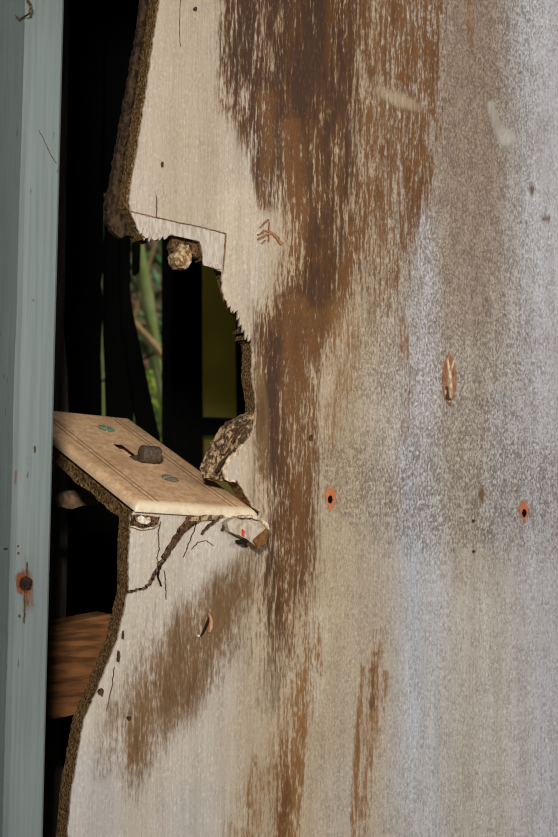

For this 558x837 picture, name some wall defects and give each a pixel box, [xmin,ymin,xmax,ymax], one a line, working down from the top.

peeling [130,211,227,272]
peeling [221,444,243,483]
spalling [130,514,160,530]
peeling [221,515,270,549]
corrosion [325,486,336,511]
corrosion [519,500,530,521]
crack [127,515,225,600]
corrosion [17,562,33,623]
peeling [196,613,213,638]
corrosion [268,627,323,837]
corrosion [350,649,387,836]